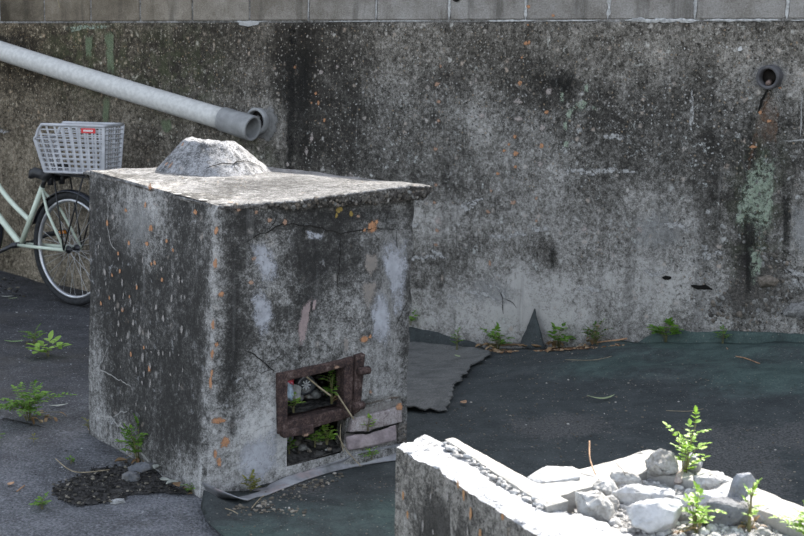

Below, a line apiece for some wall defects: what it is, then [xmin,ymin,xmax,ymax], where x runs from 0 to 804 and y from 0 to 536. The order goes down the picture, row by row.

crack [206,160,259,172]
water stain [736,151,775,285]
peeling [298,300,316,345]